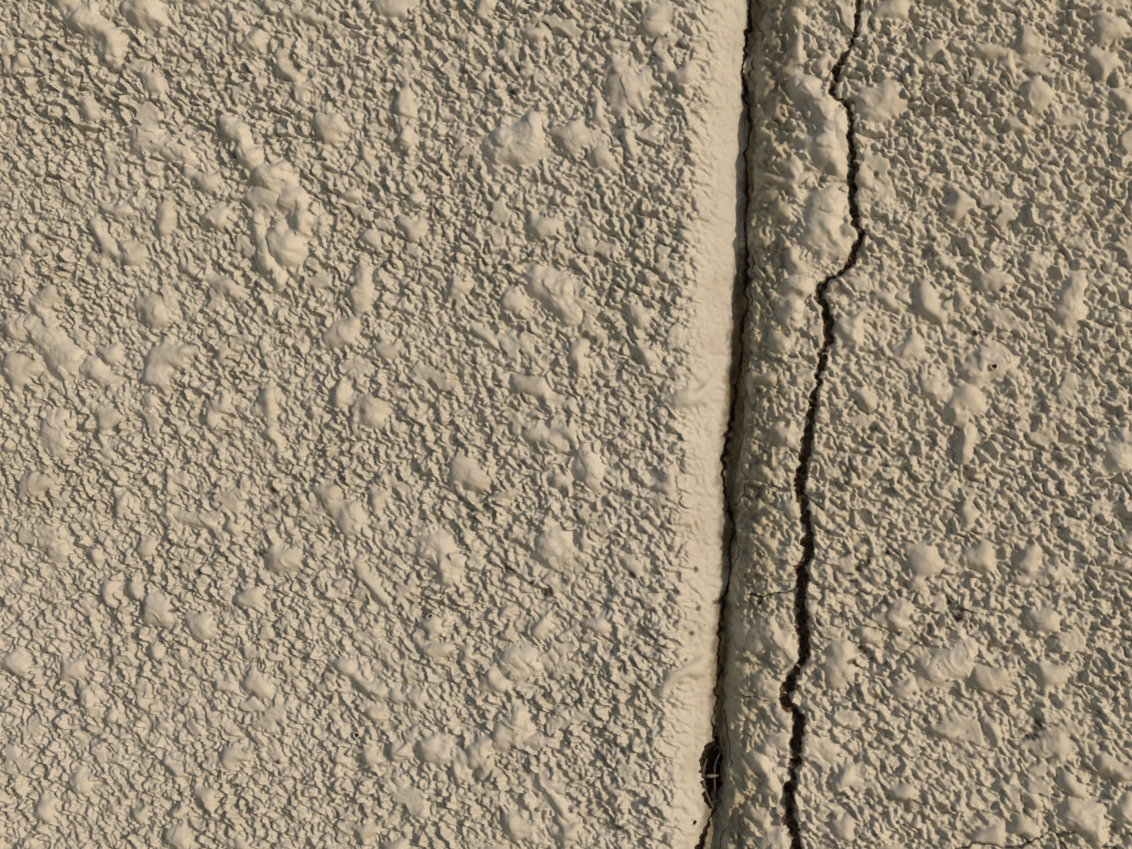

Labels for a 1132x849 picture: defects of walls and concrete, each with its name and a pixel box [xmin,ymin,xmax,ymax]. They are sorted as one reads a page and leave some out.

crack [711,0,866,849]
crack [695,805,728,849]
crack [955,829,1076,849]